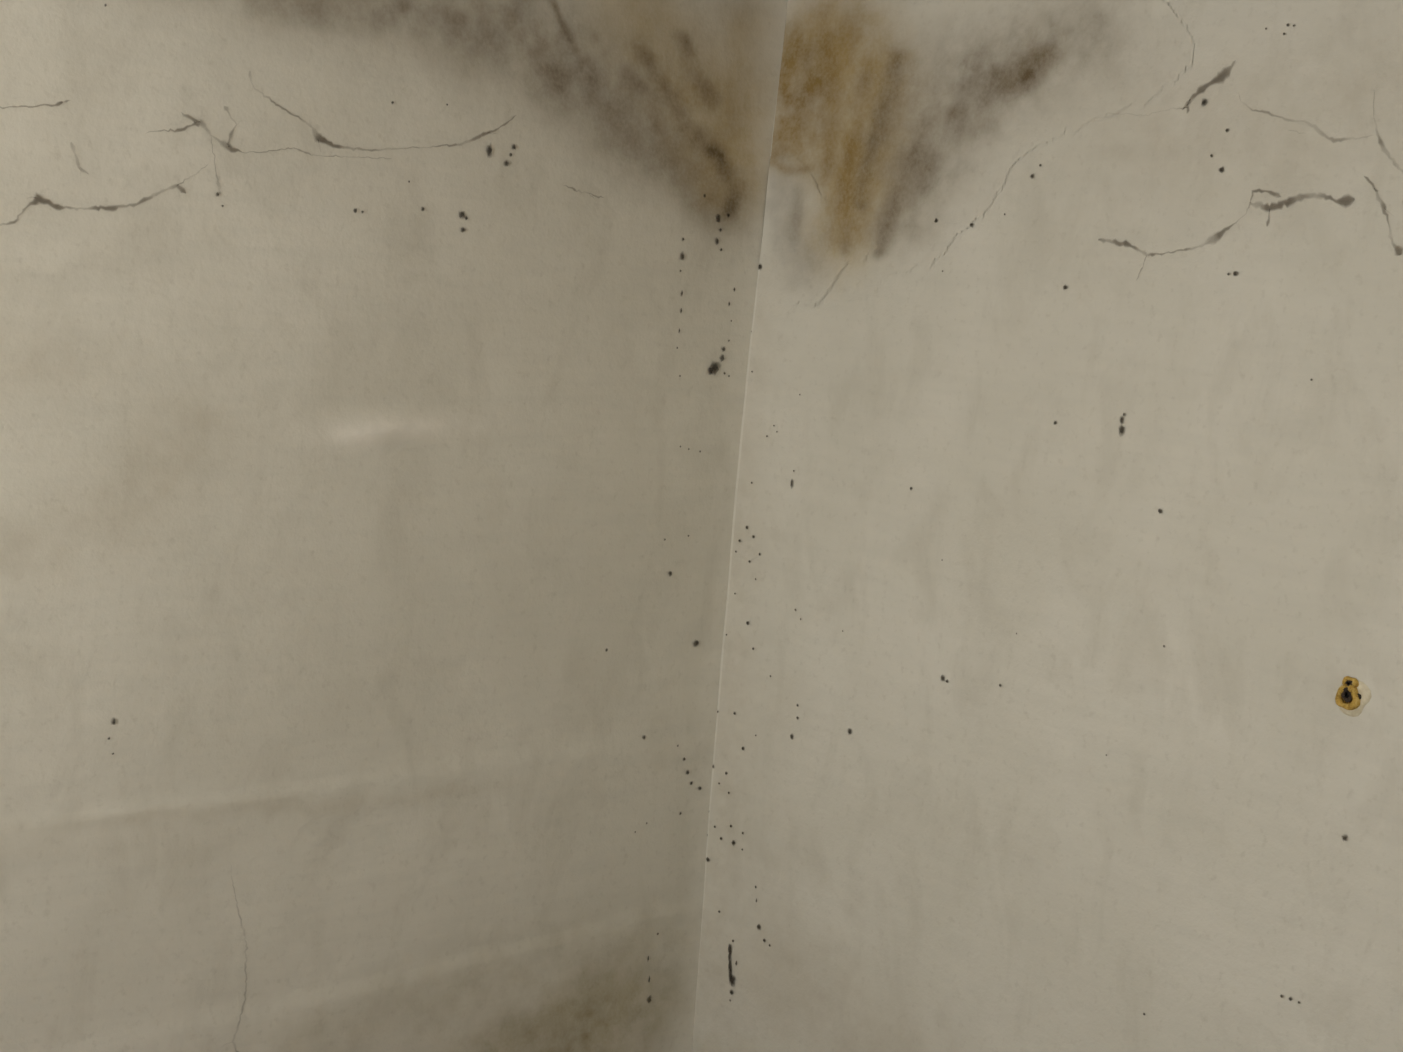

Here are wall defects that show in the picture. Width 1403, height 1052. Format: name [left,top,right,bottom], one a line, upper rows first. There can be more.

crack [1198,71,1227,92]
crack [317,136,338,147]
damp [13,0,1194,306]
crack [32,195,60,209]
crack [1266,199,1292,209]
damp [220,879,720,1052]
damp [728,940,737,1001]